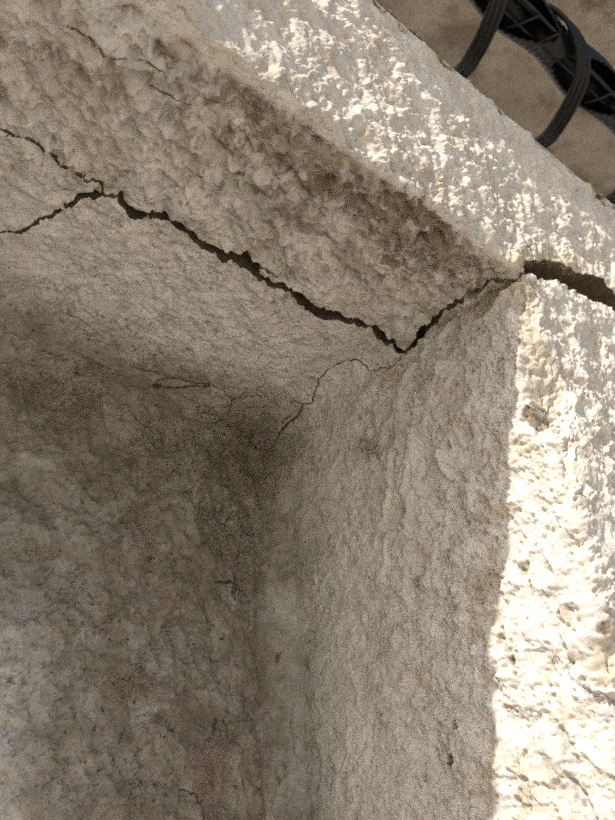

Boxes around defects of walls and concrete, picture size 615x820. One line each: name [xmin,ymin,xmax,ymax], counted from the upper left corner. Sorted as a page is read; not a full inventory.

crack [0,128,615,460]